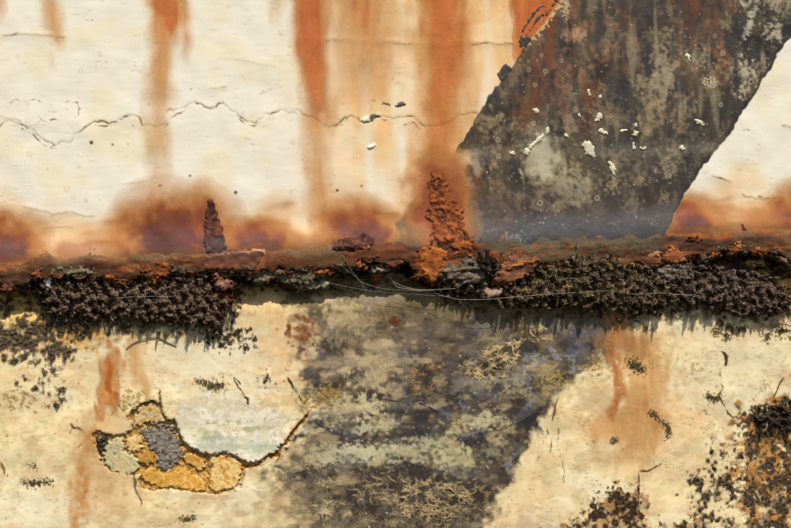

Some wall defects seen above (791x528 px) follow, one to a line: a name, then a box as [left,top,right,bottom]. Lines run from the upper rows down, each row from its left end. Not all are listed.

crack [77,102,142,131]
rust [0,0,791,297]
rust [69,340,149,528]
spalling [93,396,291,494]
rust [593,310,663,458]